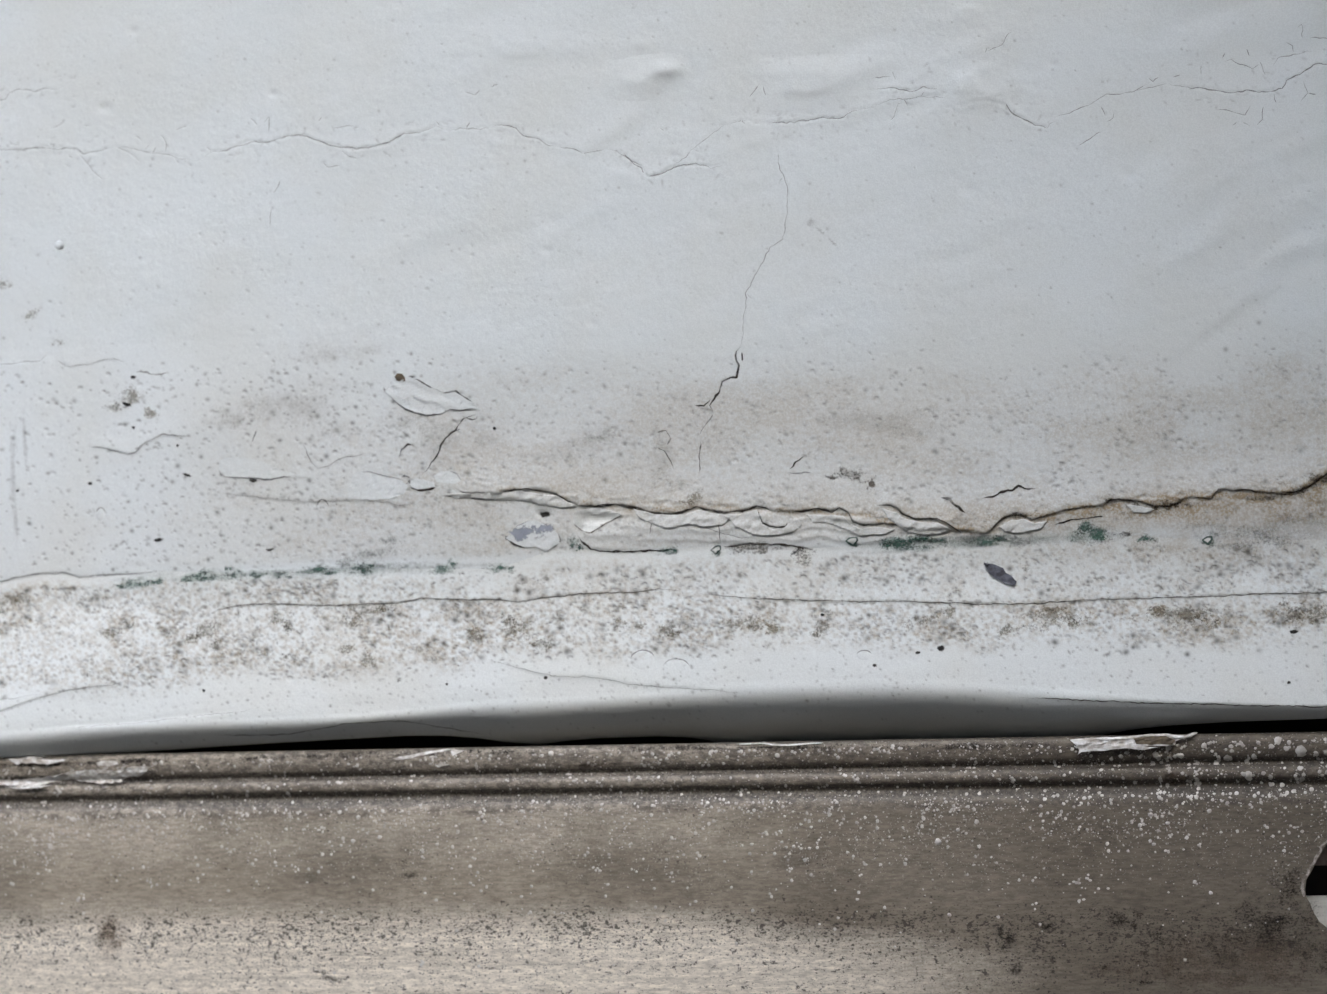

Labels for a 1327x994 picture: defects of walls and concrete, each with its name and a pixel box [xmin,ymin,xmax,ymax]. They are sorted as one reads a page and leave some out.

crack [1006,43,1327,142]
peeling [384,373,481,416]
crack [696,351,743,472]
peeling [326,454,462,500]
peeling [1198,473,1327,500]
peeling [573,508,621,533]
peeling [993,499,1173,528]
damp [879,537,944,550]
damp [182,568,292,582]
peeling [1070,732,1198,754]
peeling [9,755,65,765]